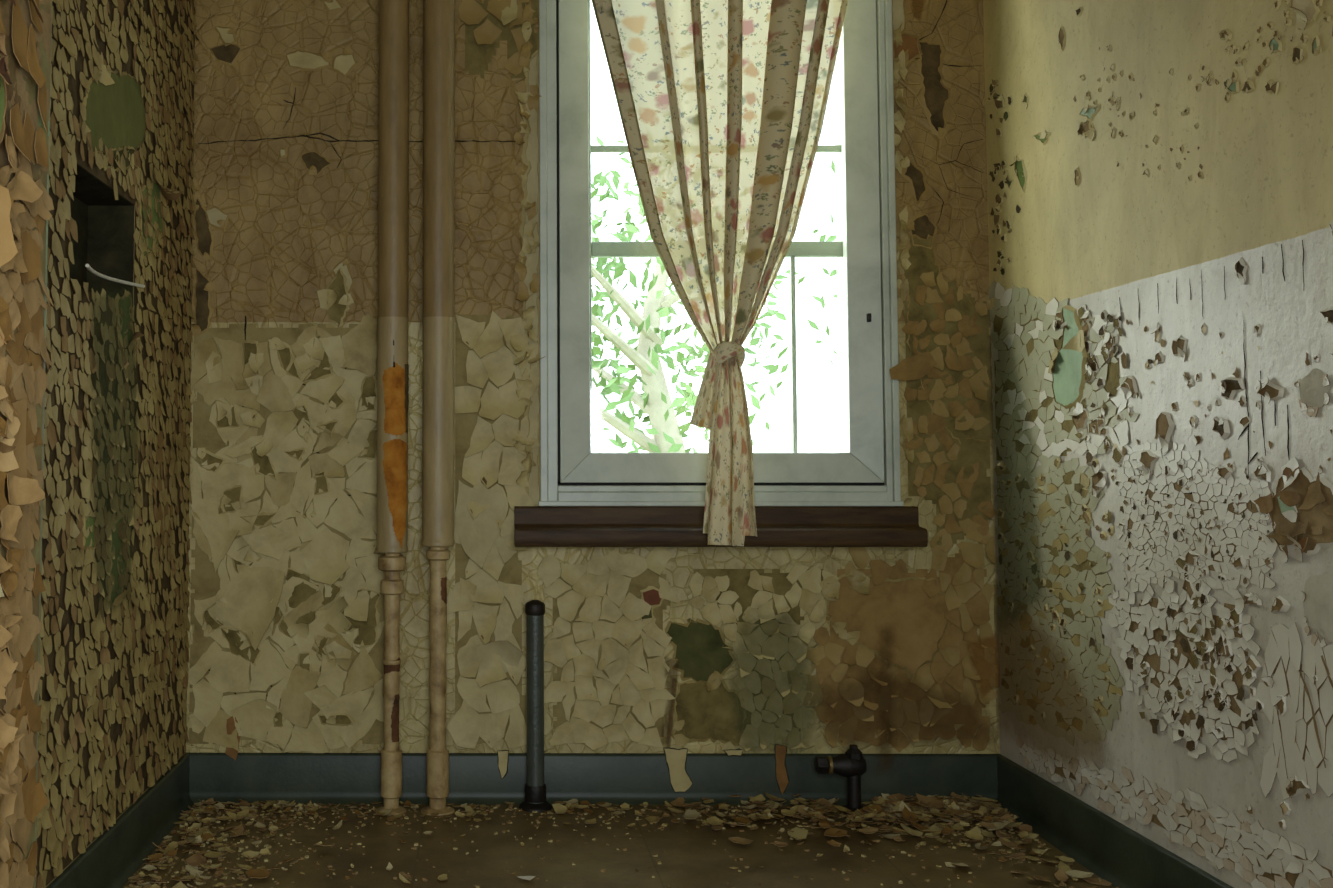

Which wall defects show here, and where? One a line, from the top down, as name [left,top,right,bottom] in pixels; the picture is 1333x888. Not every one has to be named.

crack [1119,266,1226,322]
crack [1262,240,1304,291]
rust [382,363,408,547]
peeling [441,0,1333,888]
crack [1112,328,1289,592]
crack [1255,622,1333,799]
spalling [124,798,515,888]